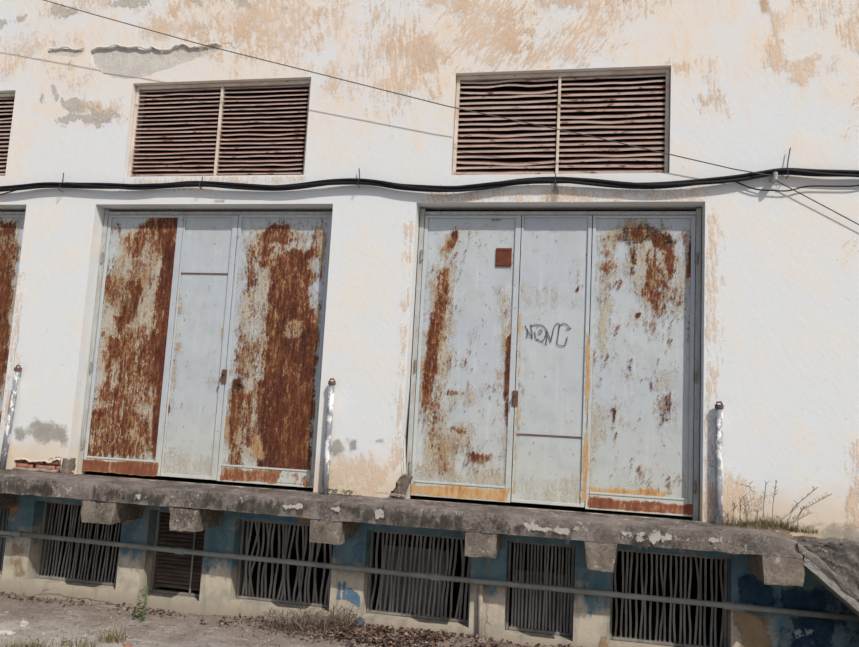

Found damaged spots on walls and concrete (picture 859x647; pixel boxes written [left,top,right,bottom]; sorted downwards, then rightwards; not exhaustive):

flaking render [4,0,349,79]
peeling [326,0,672,113]
peeling [763,8,821,85]
peeling [61,97,121,128]
rust [0,219,21,424]
rust [82,210,326,487]
rust [410,218,702,515]
flaking render [13,457,61,473]
damp [15,420,66,442]
peeling [733,574,859,647]